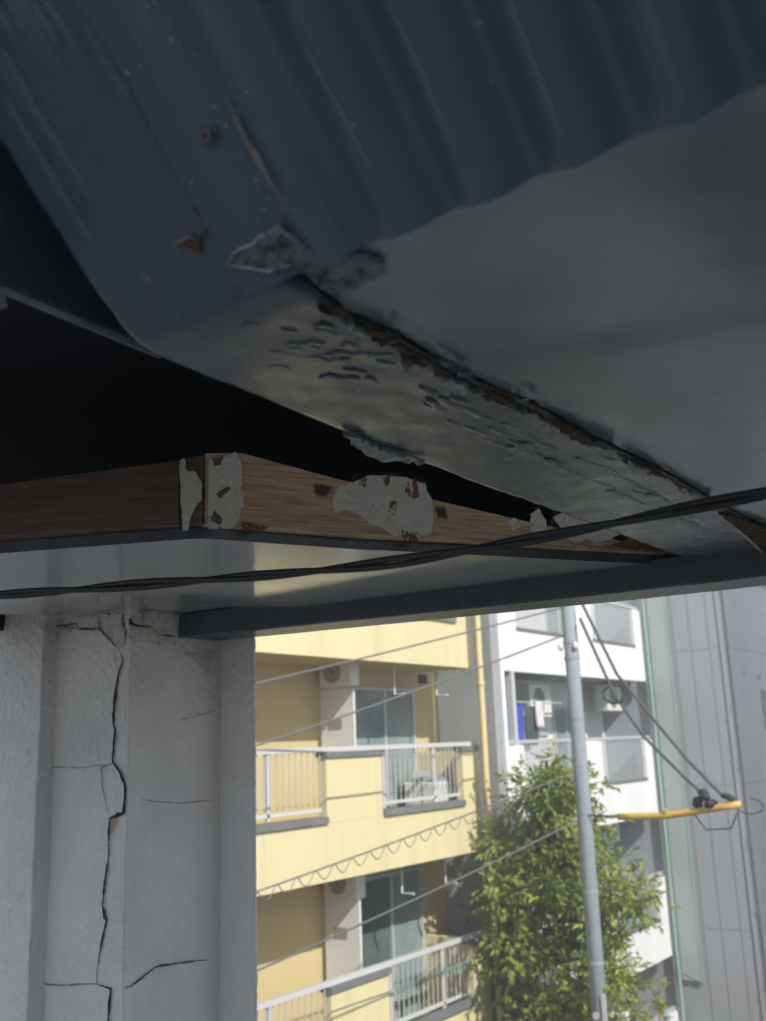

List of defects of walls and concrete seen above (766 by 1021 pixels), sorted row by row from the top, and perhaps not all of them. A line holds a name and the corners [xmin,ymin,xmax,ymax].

peeling [224,108,385,296]
peeling [342,430,425,466]
peeling [179,451,268,532]
peeling [332,475,434,544]
peeling [506,508,620,544]
crack [43,647,210,1021]